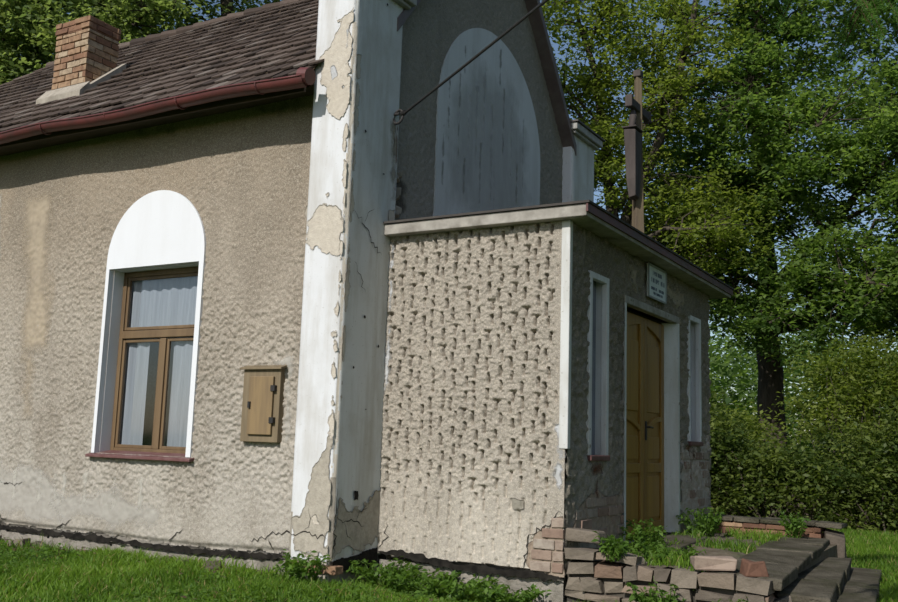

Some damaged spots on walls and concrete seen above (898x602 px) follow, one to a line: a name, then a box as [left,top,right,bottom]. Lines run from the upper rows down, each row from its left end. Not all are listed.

peeling [305,7,367,316]
peeling [331,325,355,379]
crack [0,489,367,560]
peeling [290,395,381,575]
crack [378,525,561,582]
spalling [523,490,624,577]